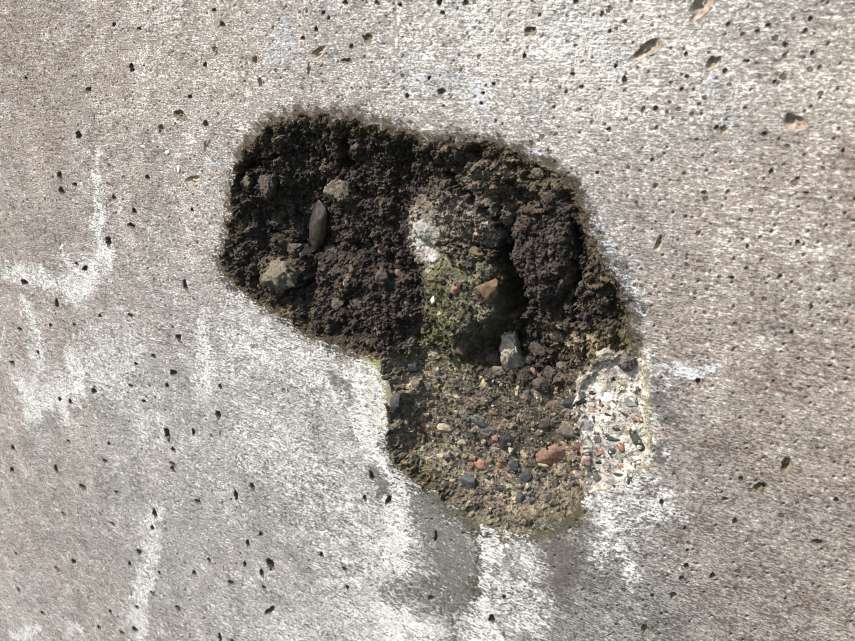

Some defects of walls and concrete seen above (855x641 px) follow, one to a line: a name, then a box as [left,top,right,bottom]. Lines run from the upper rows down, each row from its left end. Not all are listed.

spalling [219,112,653,535]